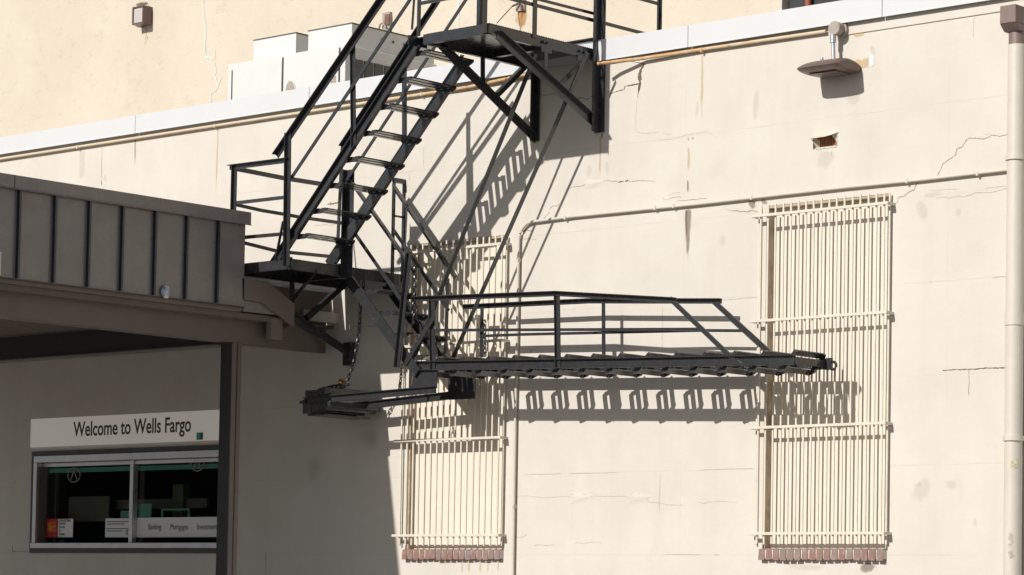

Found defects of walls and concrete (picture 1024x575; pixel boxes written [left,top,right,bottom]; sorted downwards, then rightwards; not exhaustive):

crack [540,61,711,140]
crack [895,134,1007,204]